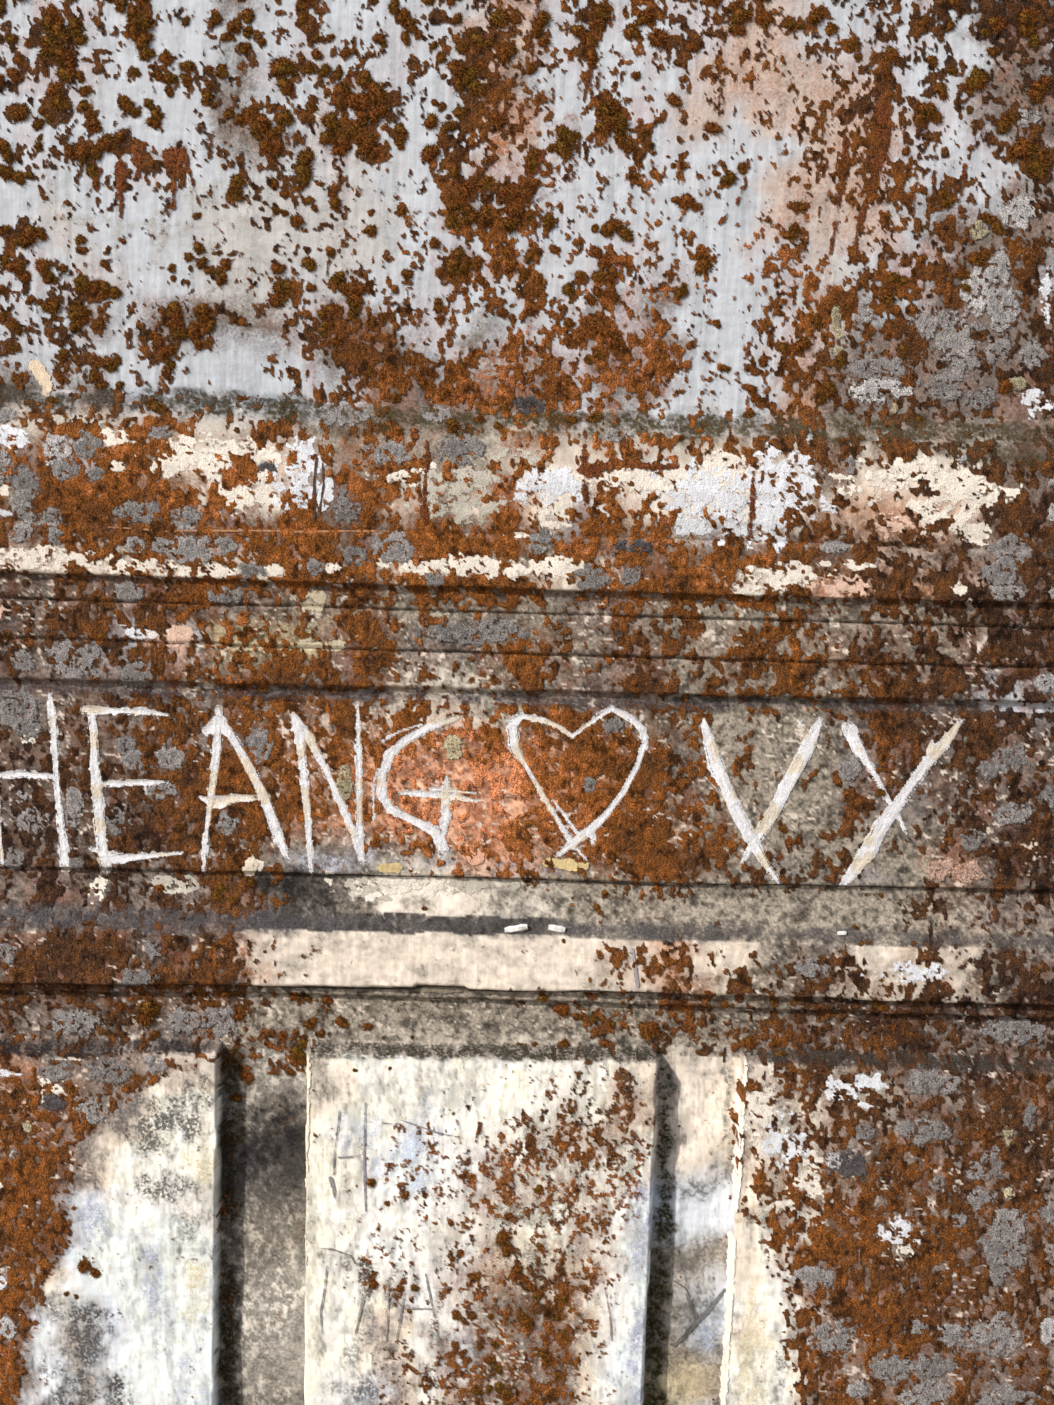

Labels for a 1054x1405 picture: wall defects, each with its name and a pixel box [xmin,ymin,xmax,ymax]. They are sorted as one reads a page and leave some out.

rust [103,233,130,287]
rust [447,421,483,443]
rust [893,469,940,501]
rust [798,764,823,792]
rust [289,990,332,1020]
rust [343,1043,654,1405]